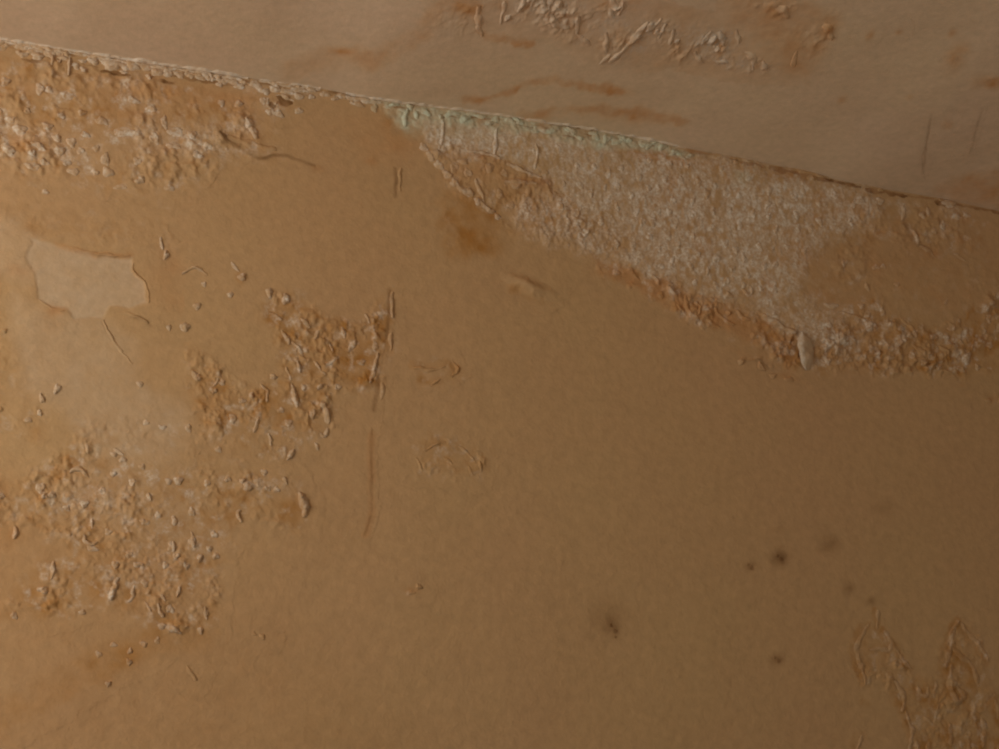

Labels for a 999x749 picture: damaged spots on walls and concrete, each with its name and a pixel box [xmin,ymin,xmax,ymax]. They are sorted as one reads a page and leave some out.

spalling [224,79,319,159]
peeling [782,312,828,391]